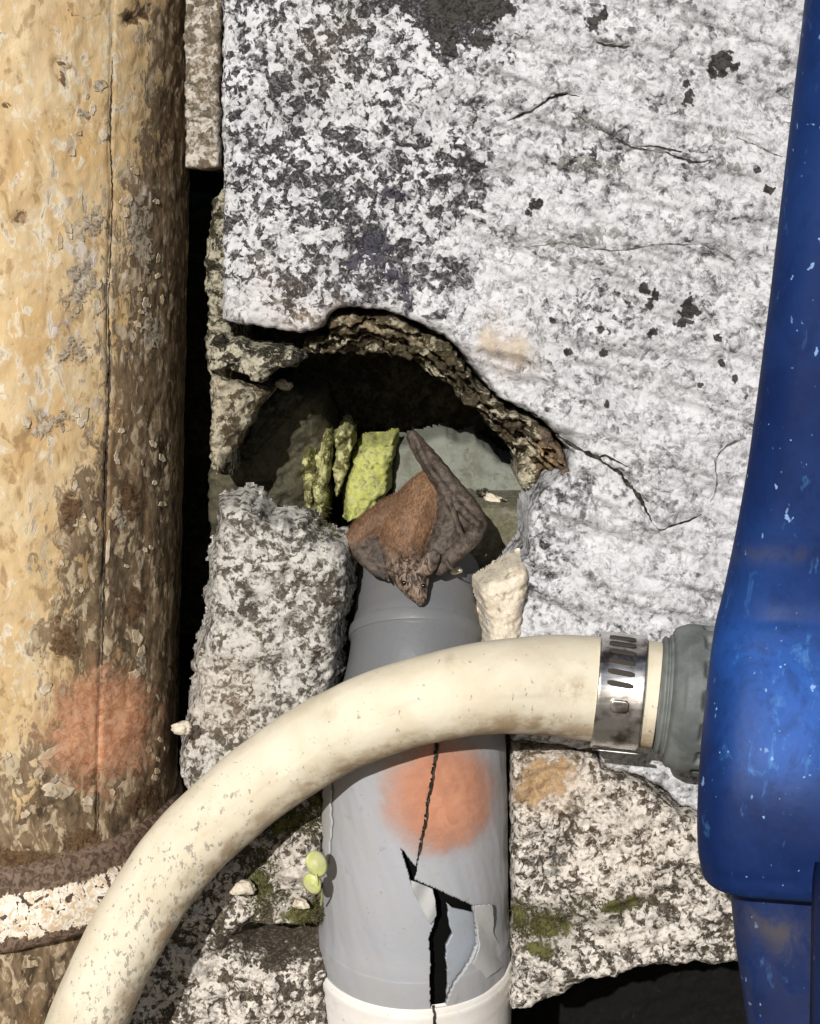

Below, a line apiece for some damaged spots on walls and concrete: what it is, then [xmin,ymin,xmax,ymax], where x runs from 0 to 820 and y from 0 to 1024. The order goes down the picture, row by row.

crack [508,93,709,163]
spalling [180,192,218,635]
spalling [248,307,570,491]
crack [471,372,745,531]
spalling [329,487,354,528]
spalling [476,488,509,502]
spalling [346,562,359,637]
damp [601,895,638,914]
damp [521,941,555,959]